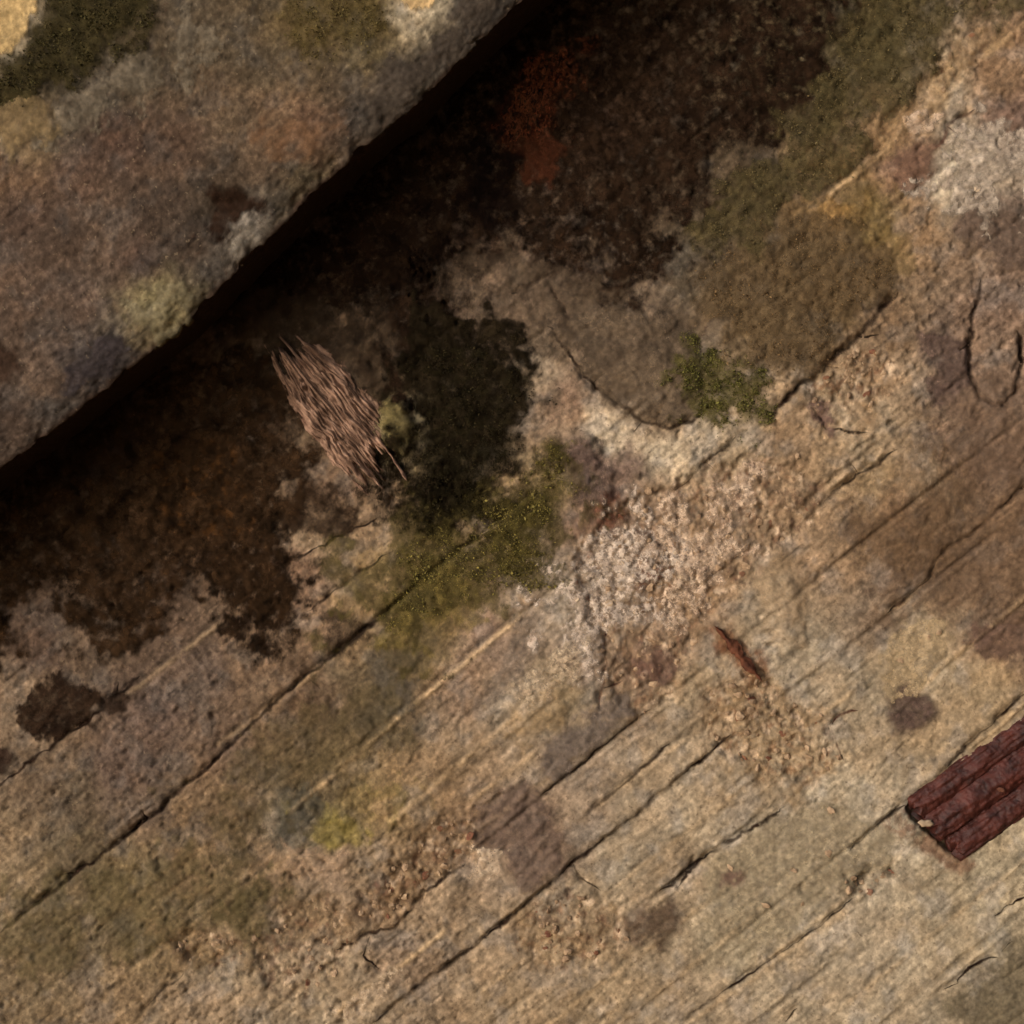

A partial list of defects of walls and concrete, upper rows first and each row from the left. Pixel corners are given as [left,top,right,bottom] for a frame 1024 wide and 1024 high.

crack [959,280,1023,406]
damp [0,336,327,672]
damp [47,720,72,740]
crack [0,532,487,933]
crack [545,710,649,792]
crack [604,744,669,800]
crack [686,735,730,772]
crack [547,839,603,889]
crack [443,903,527,969]